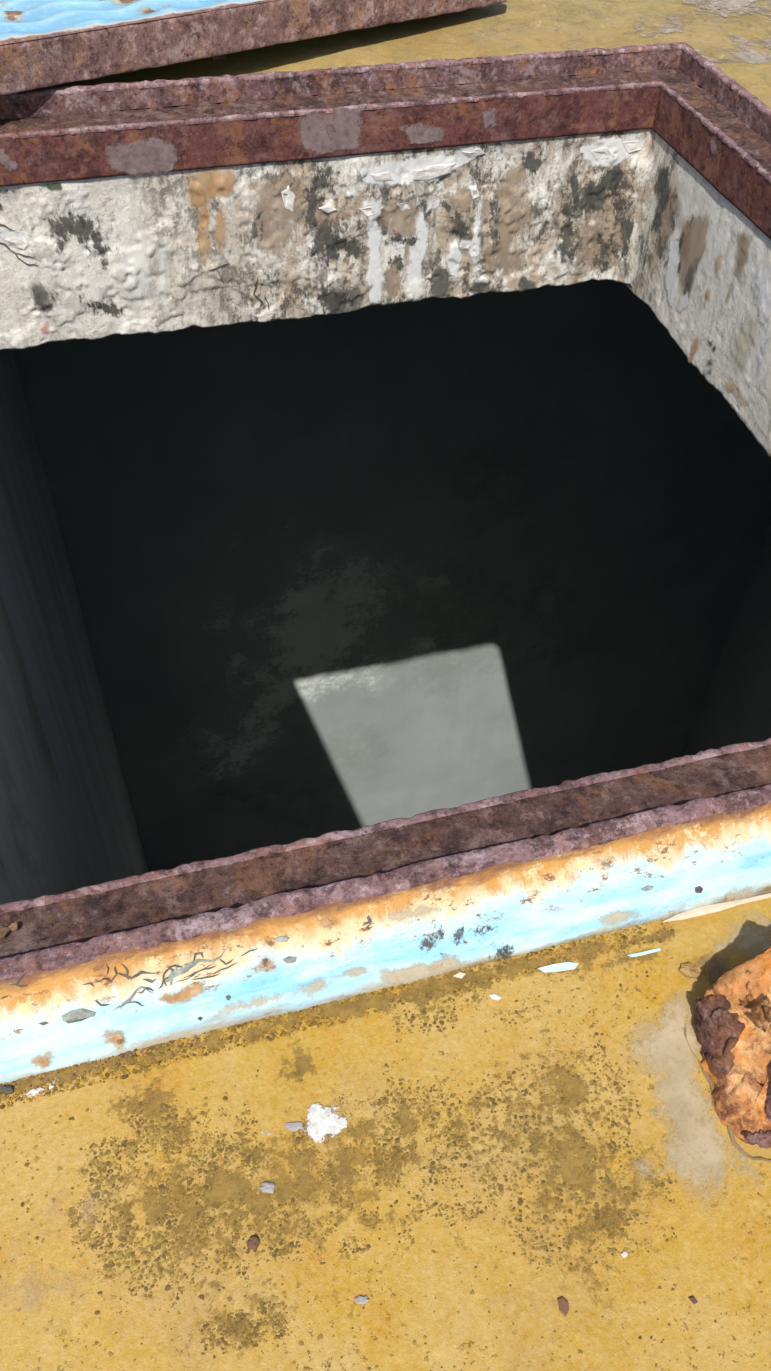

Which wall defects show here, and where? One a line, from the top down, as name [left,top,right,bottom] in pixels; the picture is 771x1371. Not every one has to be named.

rust [0,2,23,21]
rust [110,0,155,14]
damp [302,151,548,314]
damp [555,167,635,275]
damp [652,157,708,312]
damp [38,183,170,318]
peeling [628,948,661,957]
crack [83,947,258,1010]
rust [382,956,460,984]
peeling [538,962,579,973]
rust [159,984,203,1004]
peeling [38,1008,95,1026]